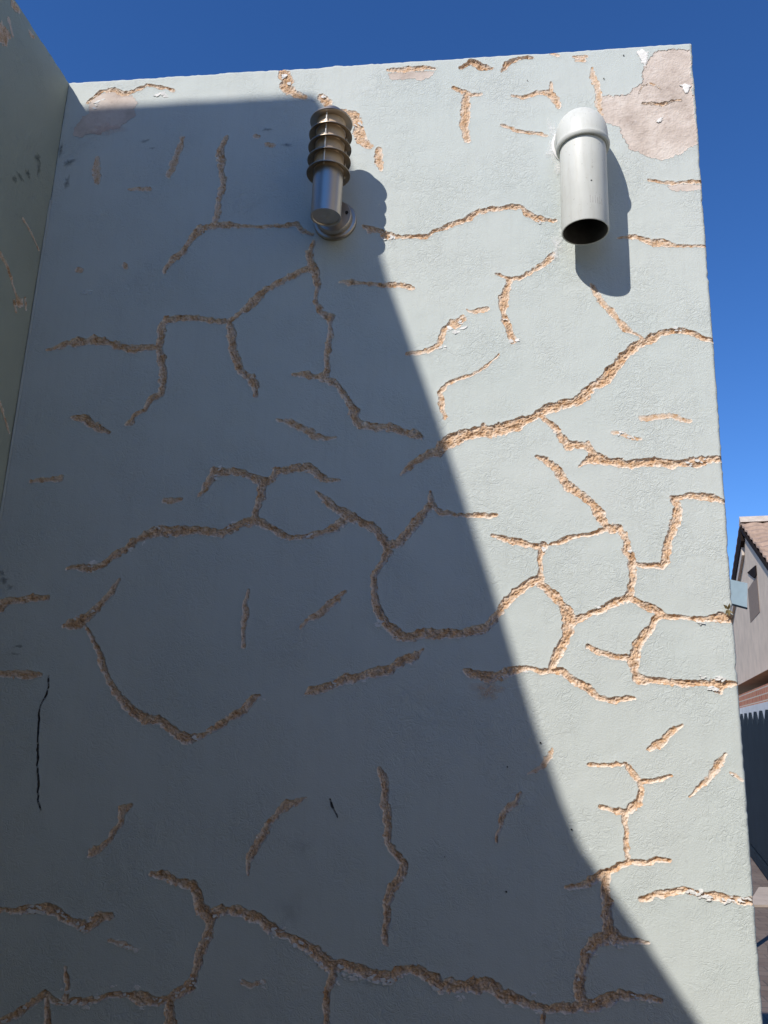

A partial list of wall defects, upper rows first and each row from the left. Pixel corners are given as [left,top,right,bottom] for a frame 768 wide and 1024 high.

peeling [73,92,137,138]
crack [386,65,483,143]
peeling [601,48,698,160]
crack [45,135,738,745]
crack [0,669,49,809]
crack [0,723,753,1024]